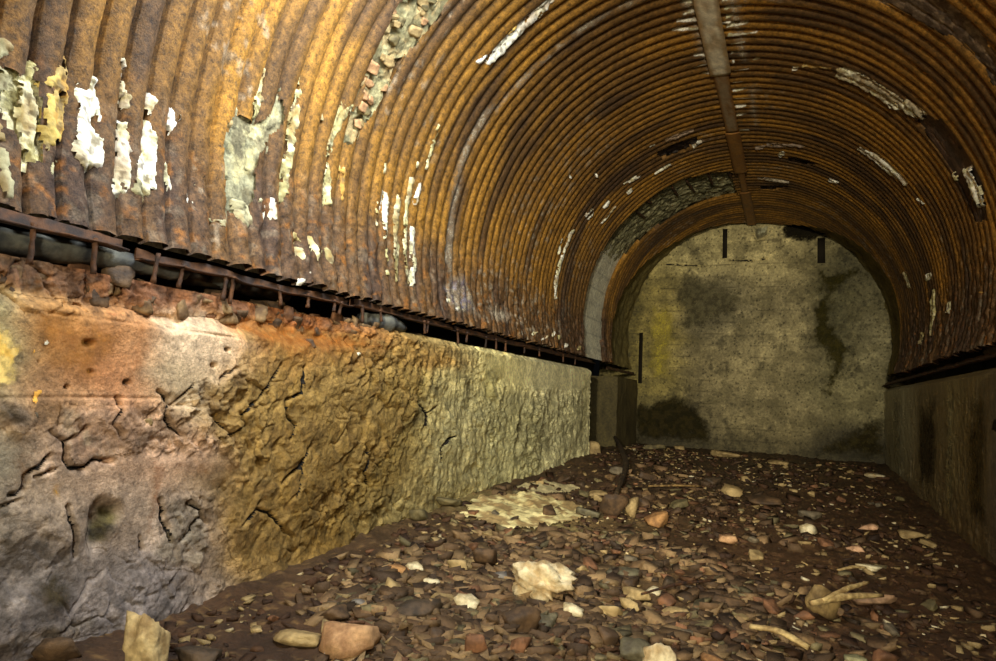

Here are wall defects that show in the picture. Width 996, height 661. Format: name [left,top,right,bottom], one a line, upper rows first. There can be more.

peeling [472,0,554,65]
peeling [0,38,181,201]
peeling [209,68,302,231]
spalling [321,0,448,207]
peeling [375,124,440,288]
damp [814,269,859,395]
crack [1,439,102,507]
crack [159,384,194,435]
crack [157,502,200,541]
crack [214,368,311,496]
crack [244,508,290,536]
damp [637,398,708,441]